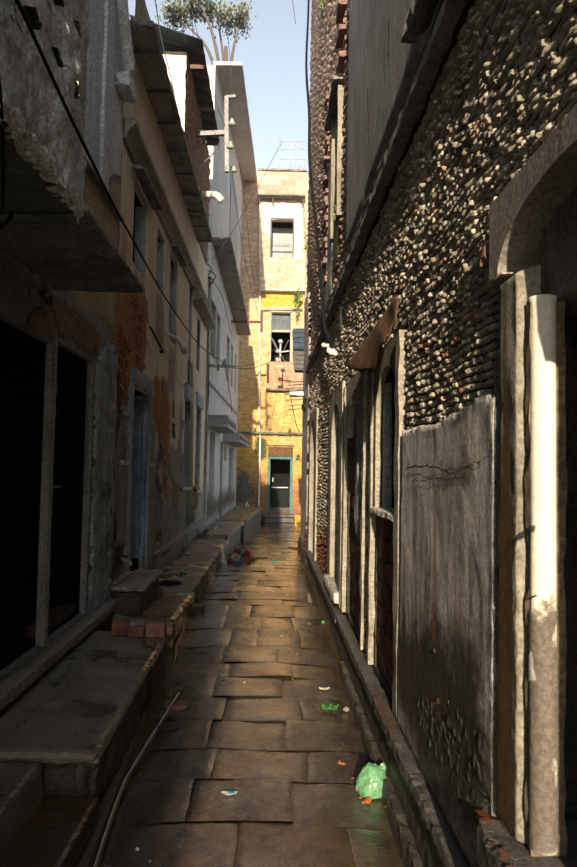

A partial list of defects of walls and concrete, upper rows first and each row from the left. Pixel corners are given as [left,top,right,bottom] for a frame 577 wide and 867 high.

flaking render [113,292,182,492]
leakage [396,386,518,840]